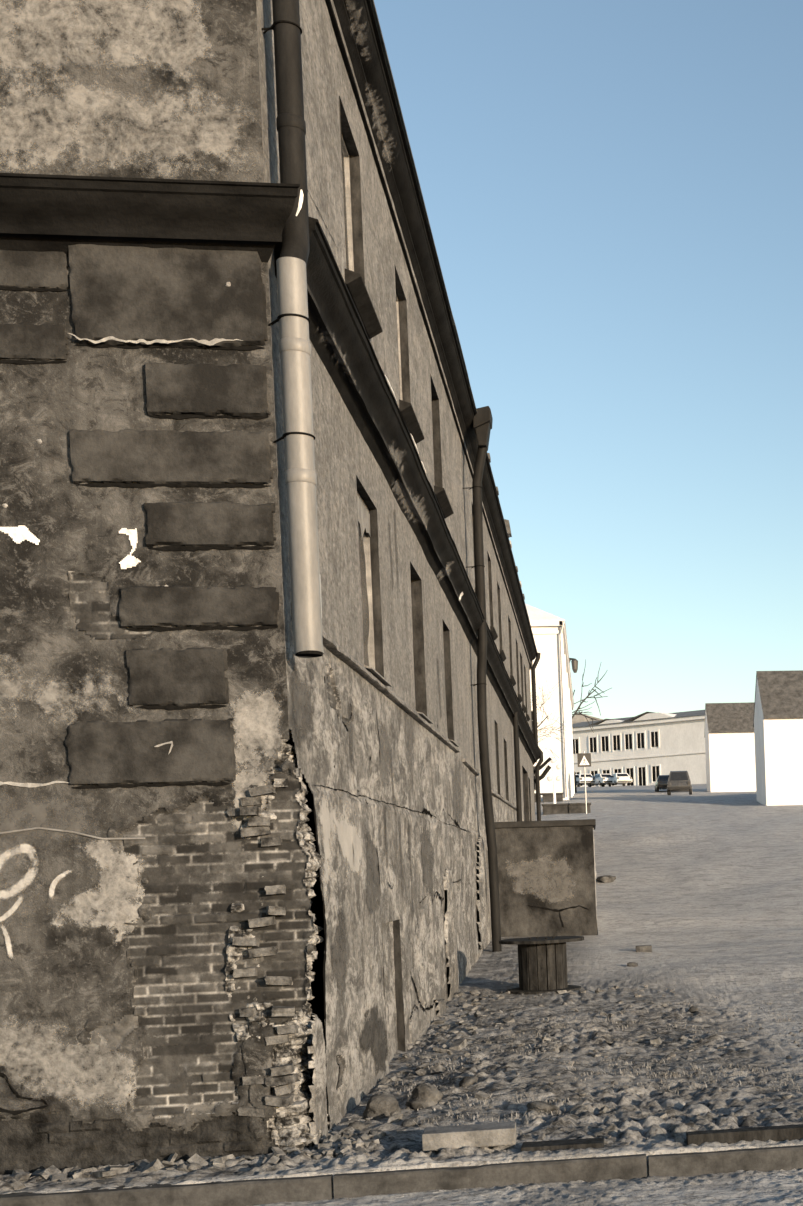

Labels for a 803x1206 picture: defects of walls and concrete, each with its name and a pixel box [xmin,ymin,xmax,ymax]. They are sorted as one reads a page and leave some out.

spalling [0,526,40,545]
spalling [119,528,141,569]
spalling [324,659,354,732]
spalling [0,690,347,1175]
crack [309,784,476,1122]
damp [360,1007,388,1073]